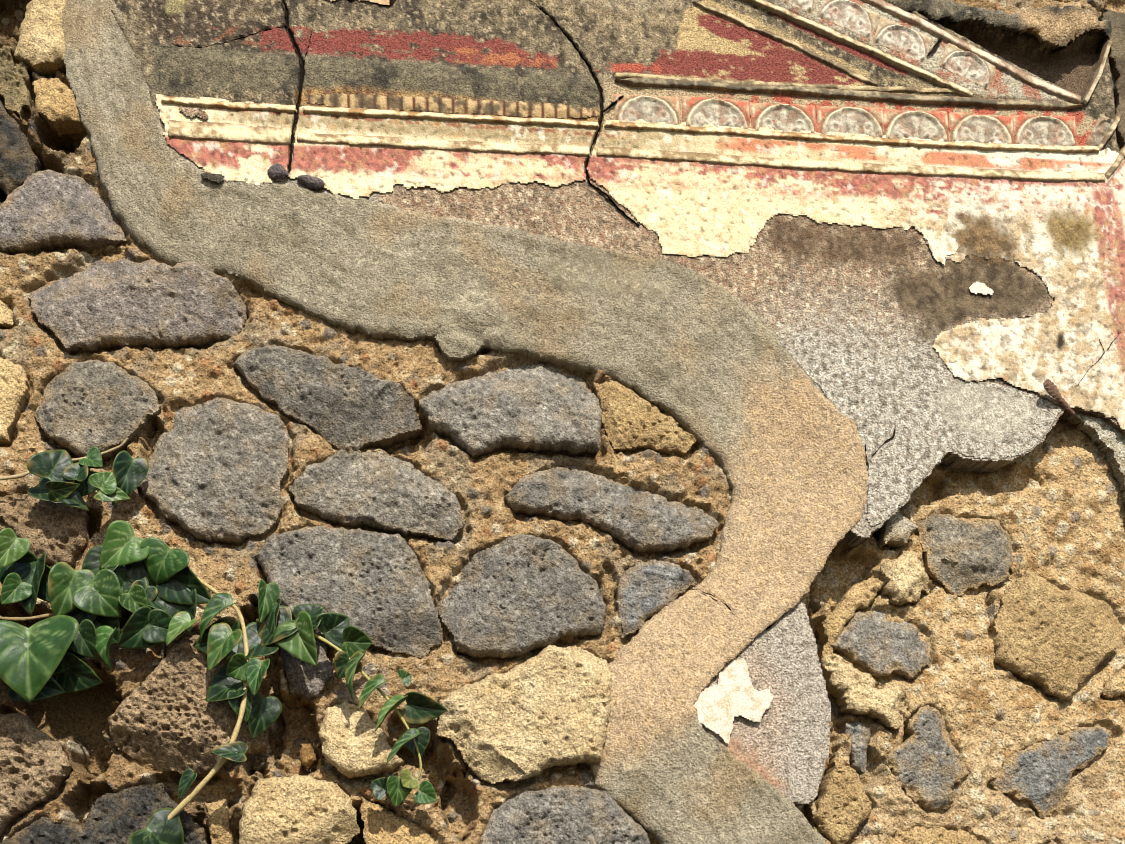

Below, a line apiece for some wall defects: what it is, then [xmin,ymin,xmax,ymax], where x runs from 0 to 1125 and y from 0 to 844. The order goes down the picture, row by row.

crack [163,0,317,172]
crack [529,0,640,226]
water stain [894,213,1046,338]
water stain [1049,210,1091,250]
spalling [379,179,1125,844]